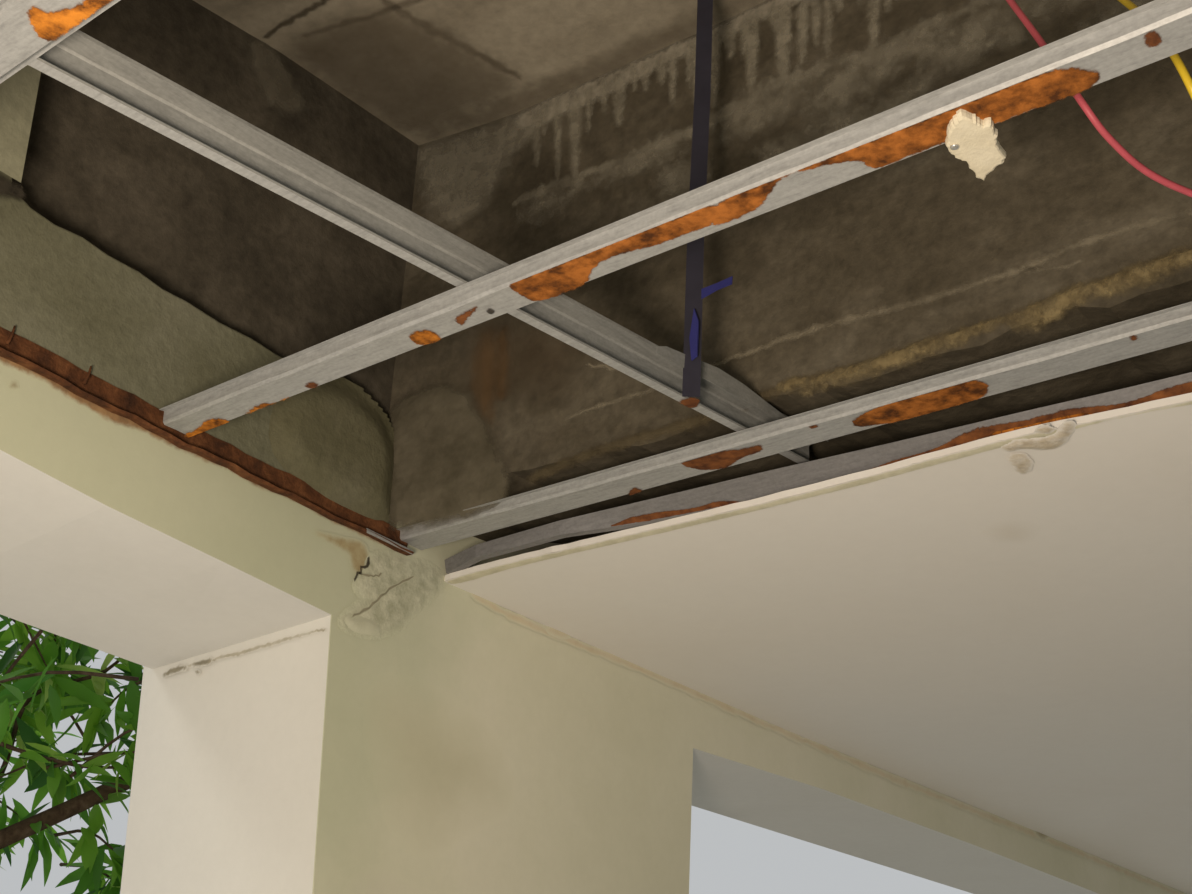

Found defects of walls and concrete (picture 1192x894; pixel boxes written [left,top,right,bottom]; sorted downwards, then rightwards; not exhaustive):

corrosion [27,0,113,41]
crack [264,0,327,38]
damp [709,0,1020,138]
damp [419,37,696,221]
damp [764,146,793,160]
corrosion [510,67,1100,301]
corrosion [852,380,988,427]
corrosion [871,382,1192,469]
corrosion [0,356,394,576]
corrosion [682,445,762,470]
corrosion [611,501,738,526]
crack [354,557,382,581]